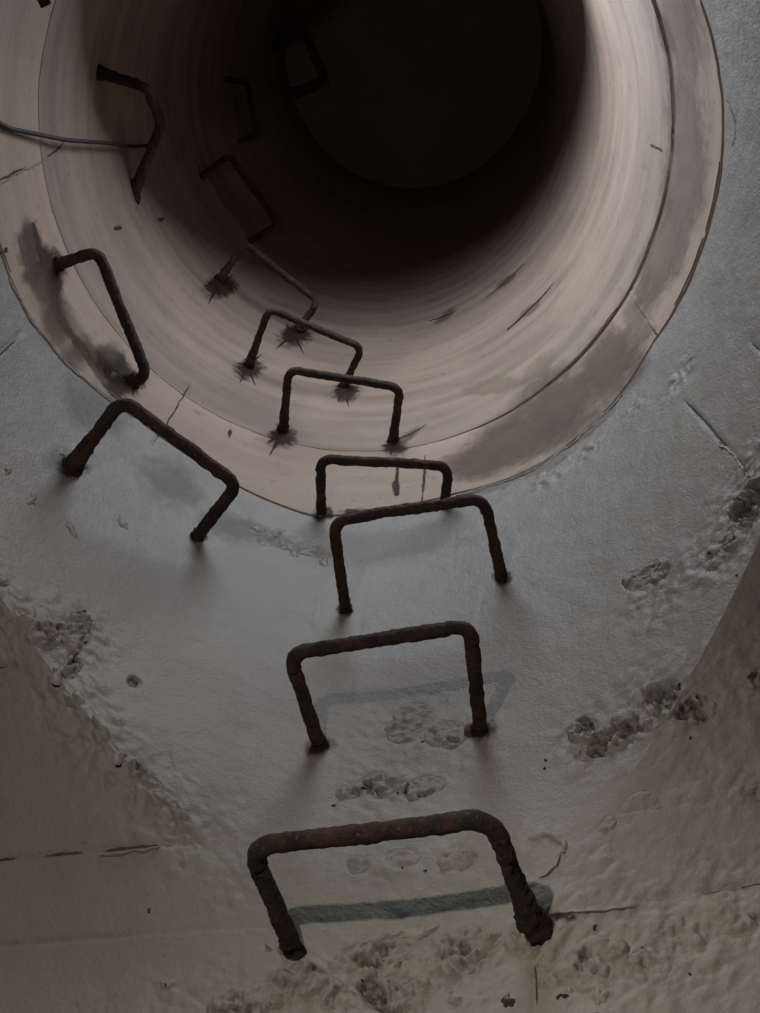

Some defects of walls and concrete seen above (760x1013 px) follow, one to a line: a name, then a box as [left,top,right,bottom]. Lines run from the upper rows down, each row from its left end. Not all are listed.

leakage [637,0,703,305]
corrosion [19,222,66,289]
leakage [486,263,524,298]
leakage [507,283,553,330]
corrosion [96,352,145,397]
corrosion [334,382,358,407]
leakage [450,331,641,477]
corrosion [267,423,295,455]
corrosion [383,437,406,455]
crack [687,402,755,479]
crack [48,844,159,857]
corrosion [513,904,577,946]